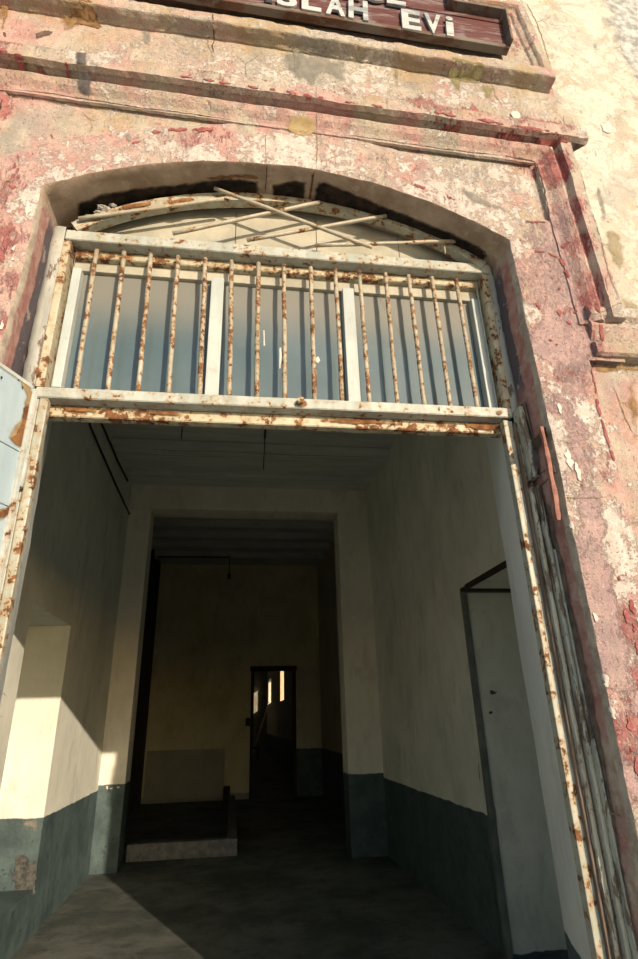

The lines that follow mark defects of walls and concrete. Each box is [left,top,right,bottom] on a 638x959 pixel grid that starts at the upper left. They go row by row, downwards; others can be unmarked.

peeling [0,233,15,263]
peeling [591,368,615,461]
flaking render [538,426,574,530]
peeling [564,449,582,481]
peeling [624,599,638,654]
peeling [608,707,634,731]